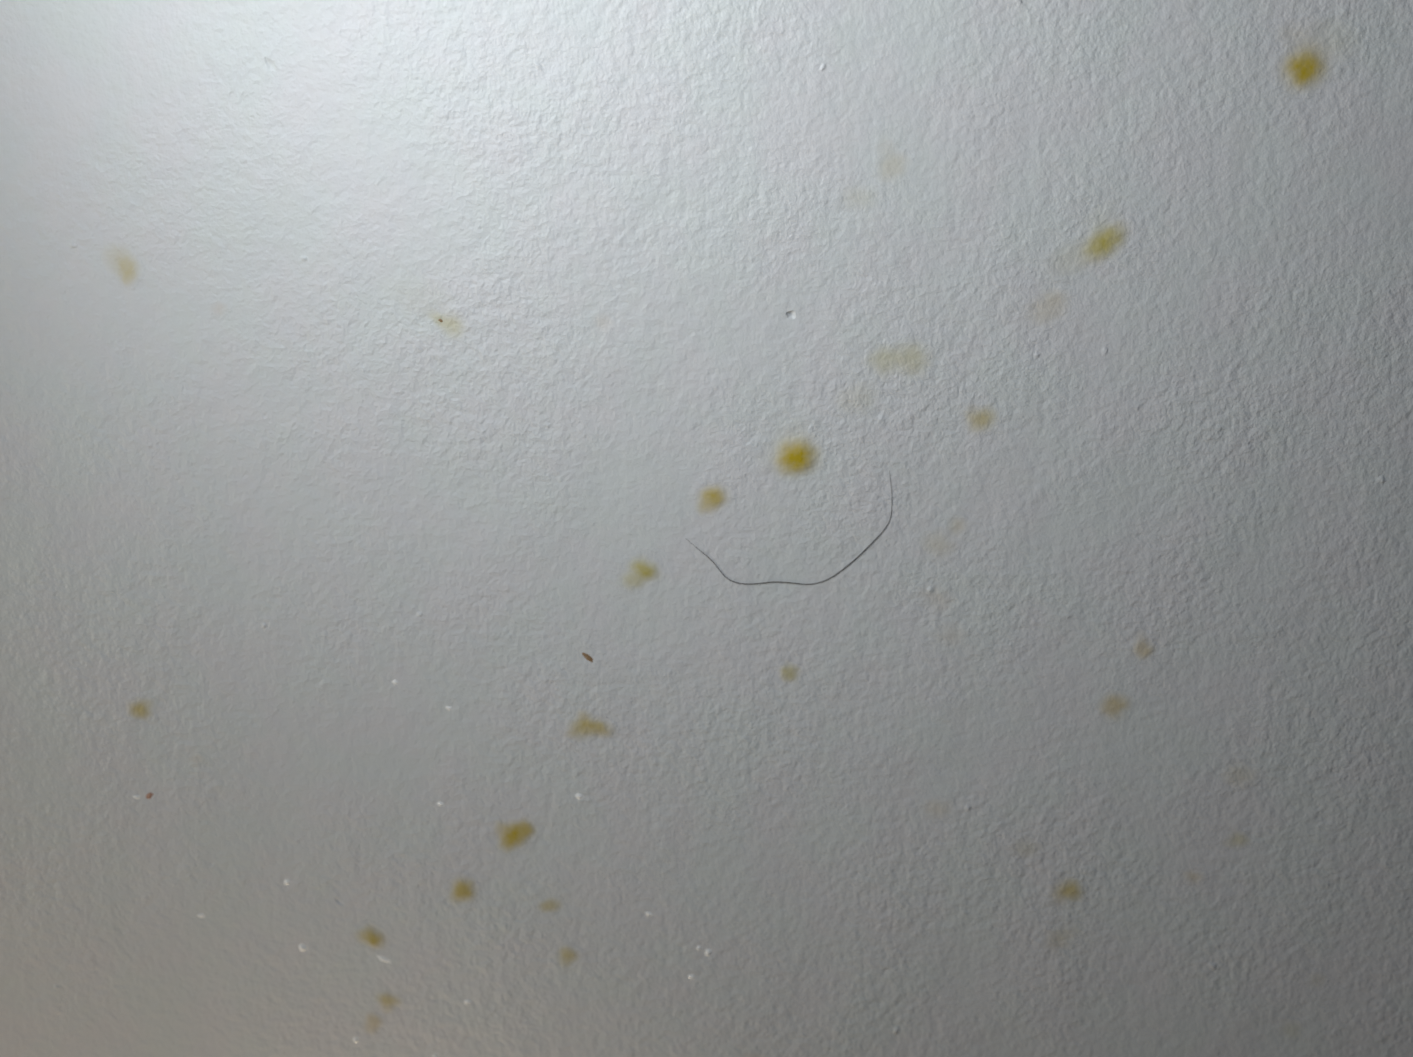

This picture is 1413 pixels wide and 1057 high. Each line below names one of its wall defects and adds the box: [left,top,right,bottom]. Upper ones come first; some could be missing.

water stain [1272,10,1368,99]
water stain [1018,198,1135,332]
water stain [753,416,829,482]
water stain [692,481,734,519]
water stain [614,552,665,593]
water stain [561,707,619,744]
water stain [492,815,540,856]
water stain [446,872,481,908]
water stain [350,920,392,953]